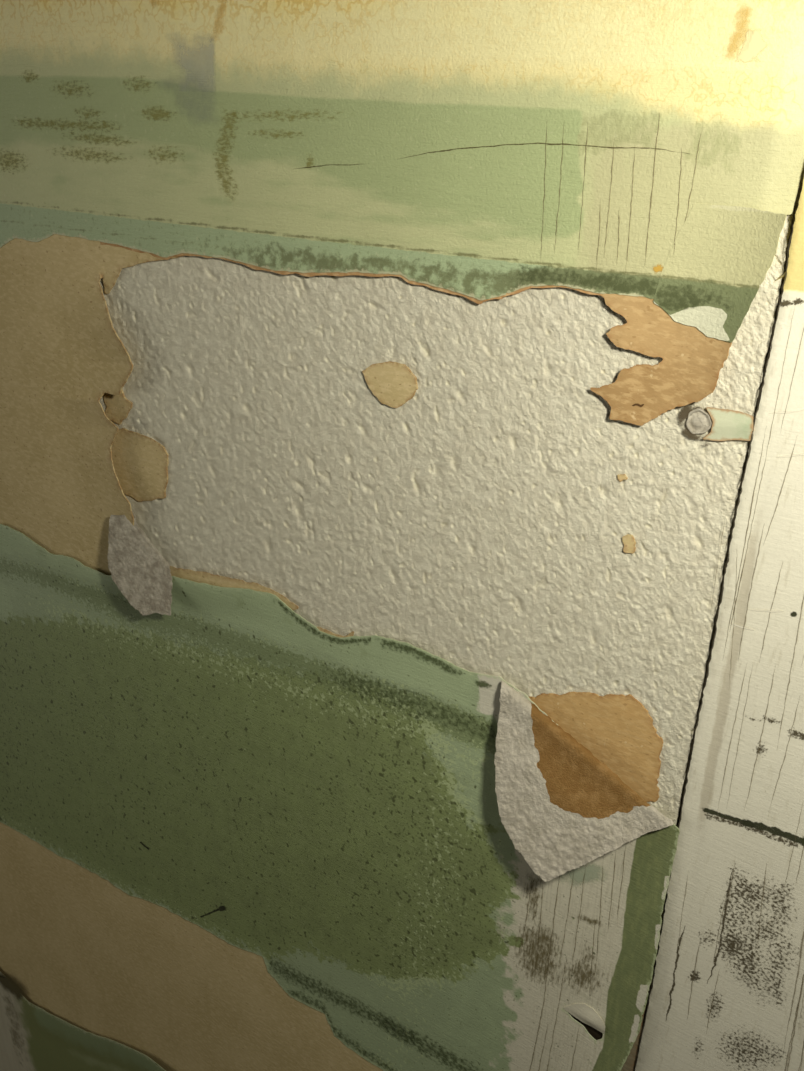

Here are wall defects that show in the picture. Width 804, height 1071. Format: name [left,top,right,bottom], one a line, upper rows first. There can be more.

crack [405,143,689,158]
crack [678,225,793,837]
peeling [0,256,748,1071]
water stain [666,927,685,1020]
water stain [688,868,797,1018]
crack [634,974,654,1071]
water stain [720,1032,785,1071]